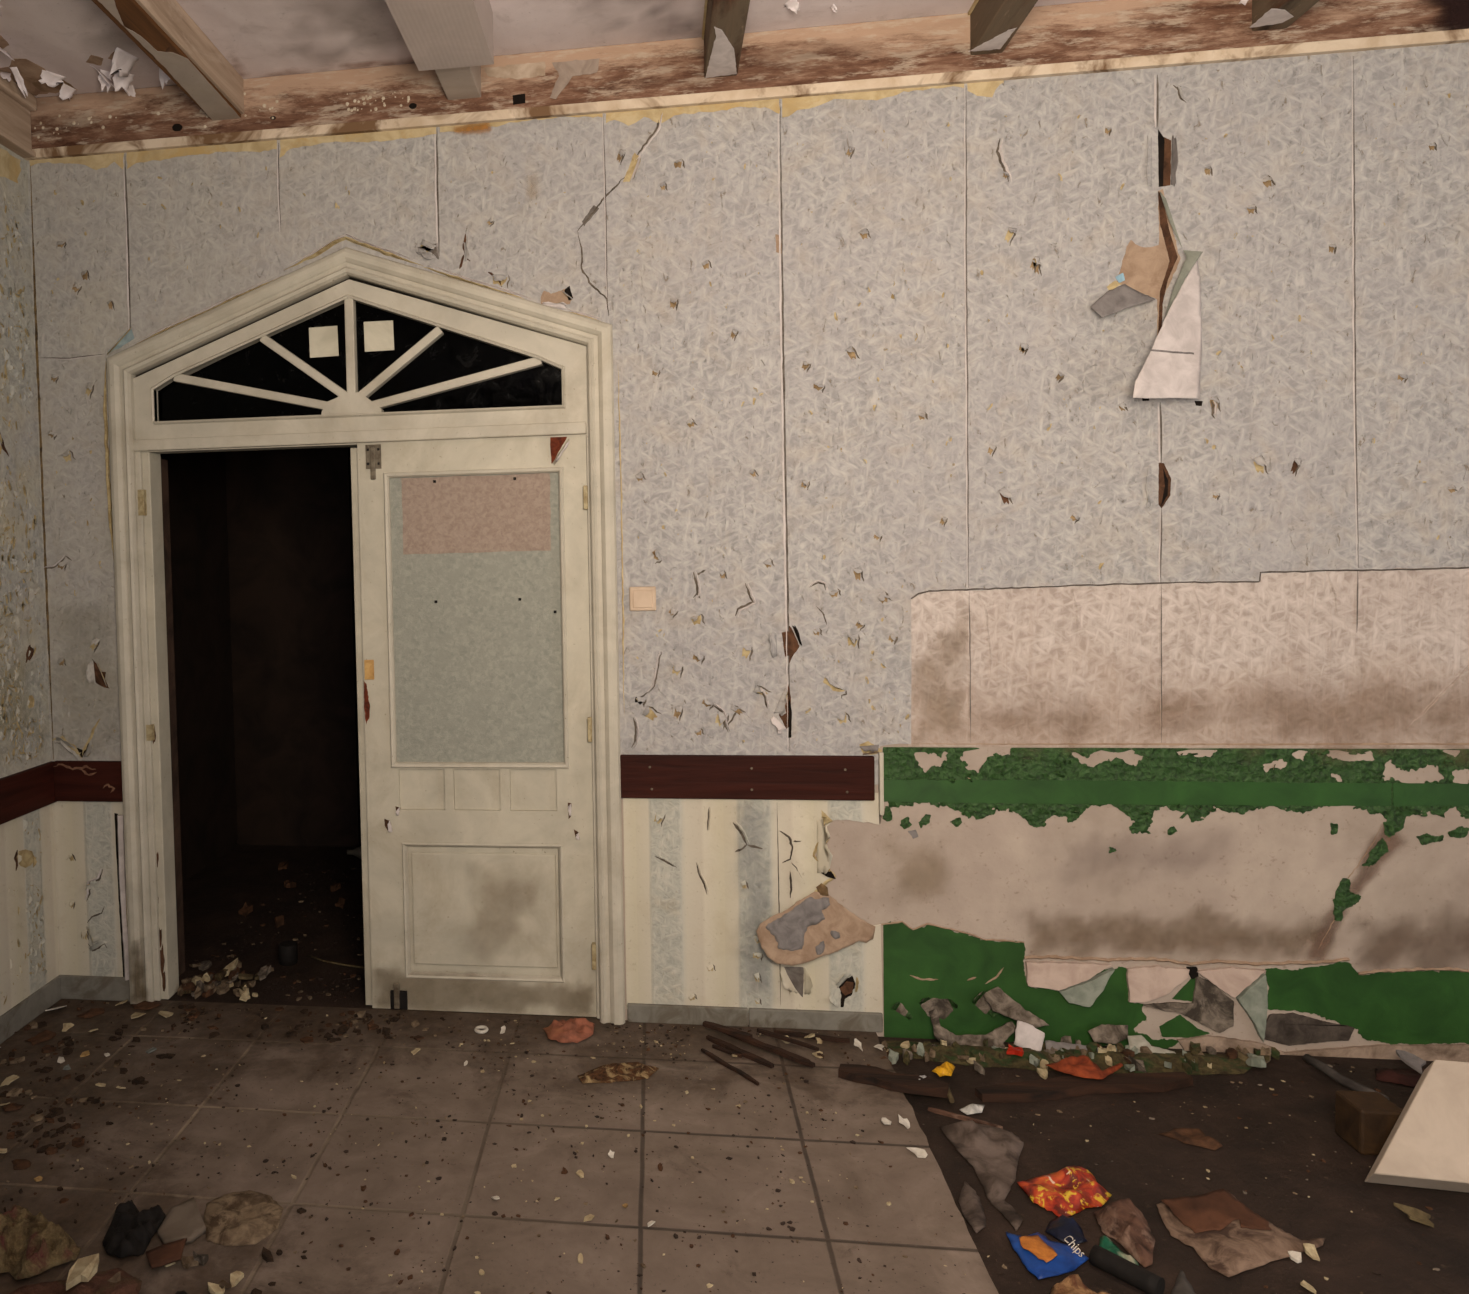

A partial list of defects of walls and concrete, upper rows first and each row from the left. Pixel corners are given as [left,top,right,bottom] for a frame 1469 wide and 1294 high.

peeling [0,35,77,100]
peeling [86,0,240,121]
water stain [1430,0,1469,31]
crack [577,113,663,316]
peeling [859,745,1469,867]
peeling [1333,878,1361,921]
peeling [854,921,1469,1062]